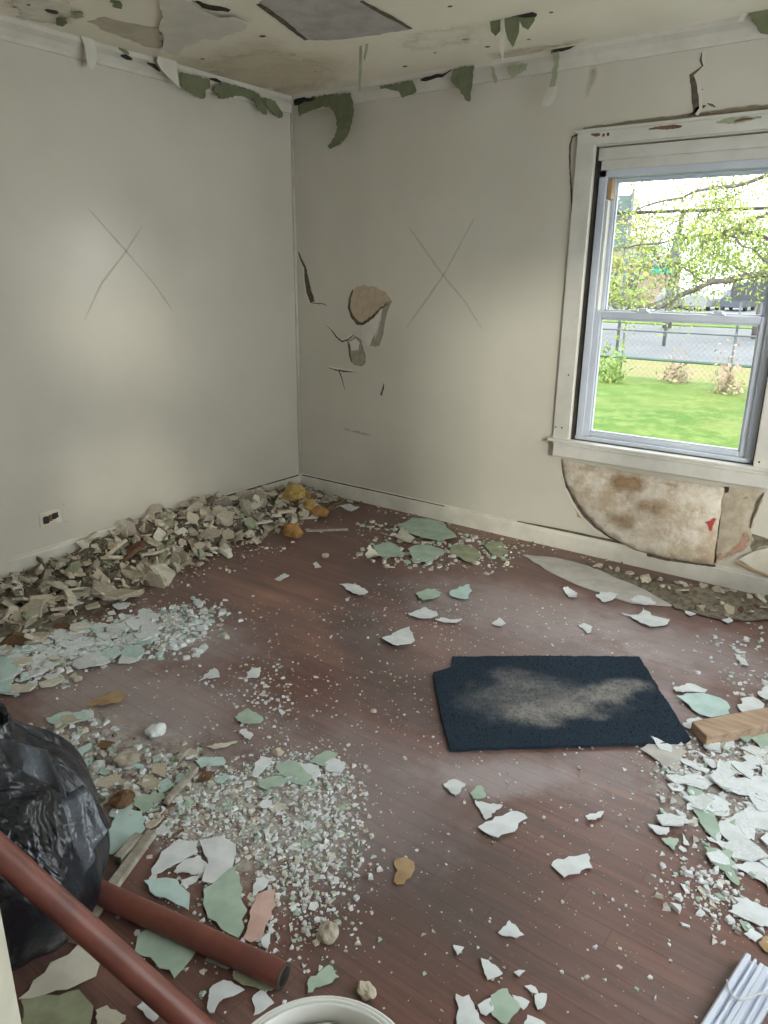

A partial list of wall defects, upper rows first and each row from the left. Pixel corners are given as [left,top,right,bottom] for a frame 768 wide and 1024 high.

peeling [56,0,283,118]
spalling [256,0,416,149]
peeling [451,66,474,102]
peeling [490,12,537,83]
crack [687,52,716,118]
crack [297,252,354,342]
spalling [347,285,392,366]
crack [328,366,356,389]
leakage [613,476,659,513]
peeling [715,486,768,565]